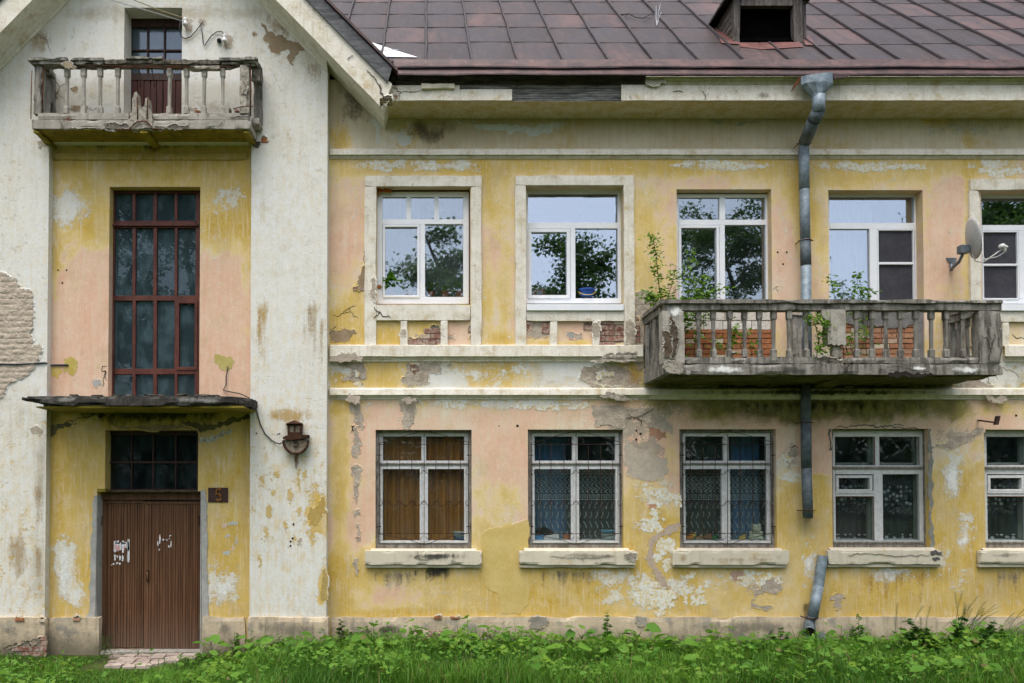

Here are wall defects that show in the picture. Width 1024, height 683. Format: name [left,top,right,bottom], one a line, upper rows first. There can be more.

peeling [252,23,305,66]
flaking render [0,270,53,400]
flaking render [329,327,358,344]
flaking render [398,323,471,345]
flaking render [566,288,656,346]
spalling [661,310,691,376]
flaking render [400,362,482,388]
flaking render [578,362,644,388]
flaking render [512,399,709,630]
flaking render [730,569,784,612]